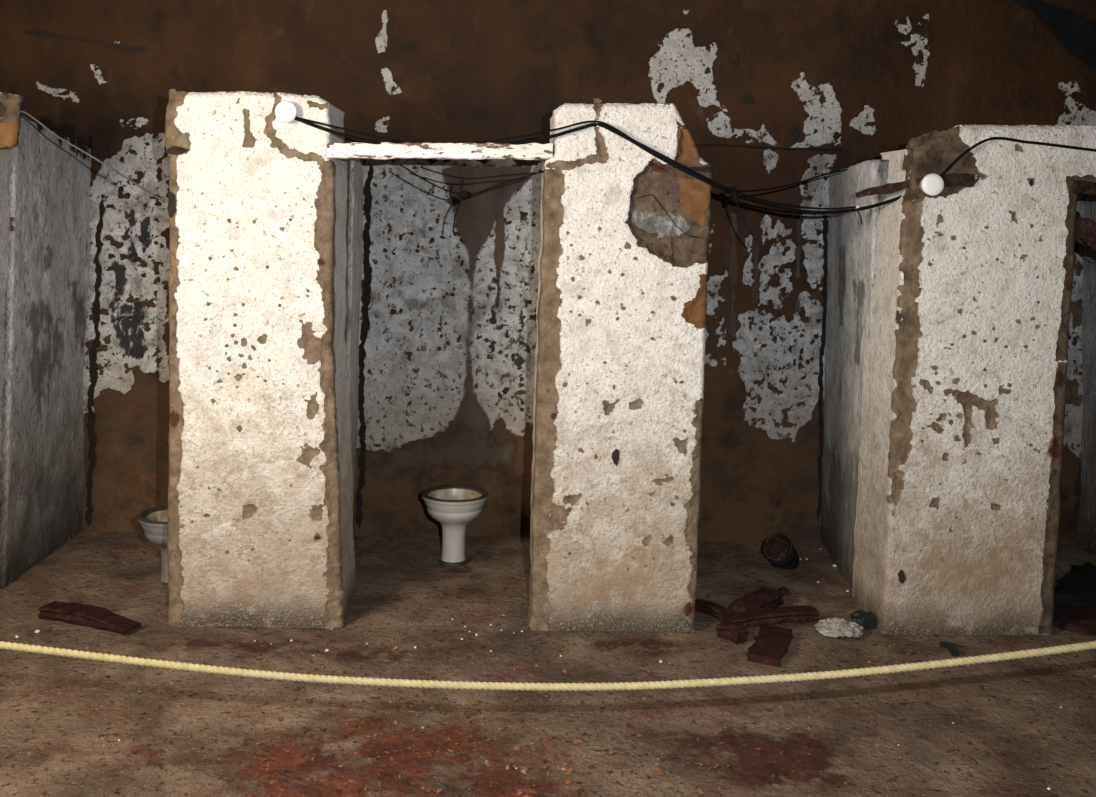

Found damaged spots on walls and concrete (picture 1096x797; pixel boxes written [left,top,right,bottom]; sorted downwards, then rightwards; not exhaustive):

peeling [375,10,388,53]
peeling [380,68,402,95]
peeling [648,28,779,173]
water stain [1015,0,1096,68]
peeling [1056,81,1096,126]
peeling [83,89,210,624]
flaking render [236,92,344,630]
peeling [356,98,609,631]
flaking render [602,385,644,416]
flaking render [627,398,704,633]
peeling [619,72,876,442]
flaking render [886,126,1012,516]